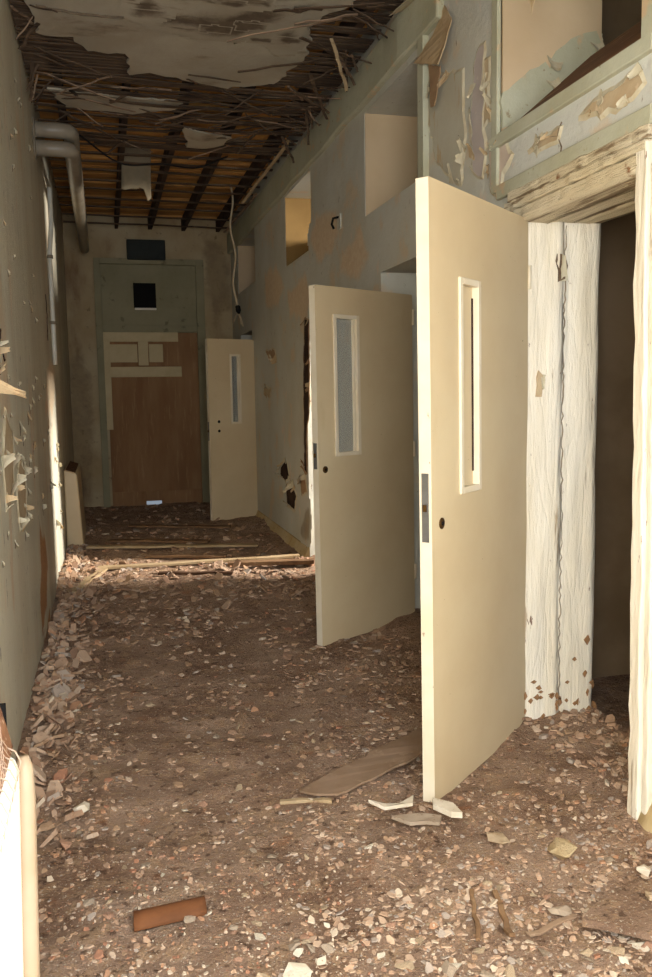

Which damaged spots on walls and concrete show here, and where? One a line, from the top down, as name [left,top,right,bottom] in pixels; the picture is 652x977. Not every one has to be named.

leakage [106,0,322,58]
peeling [389,0,414,16]
peeling [414,5,514,197]
peeling [578,62,647,121]
peeling [527,125,564,158]
peeling [0,340,62,549]
spalling [524,670,596,718]